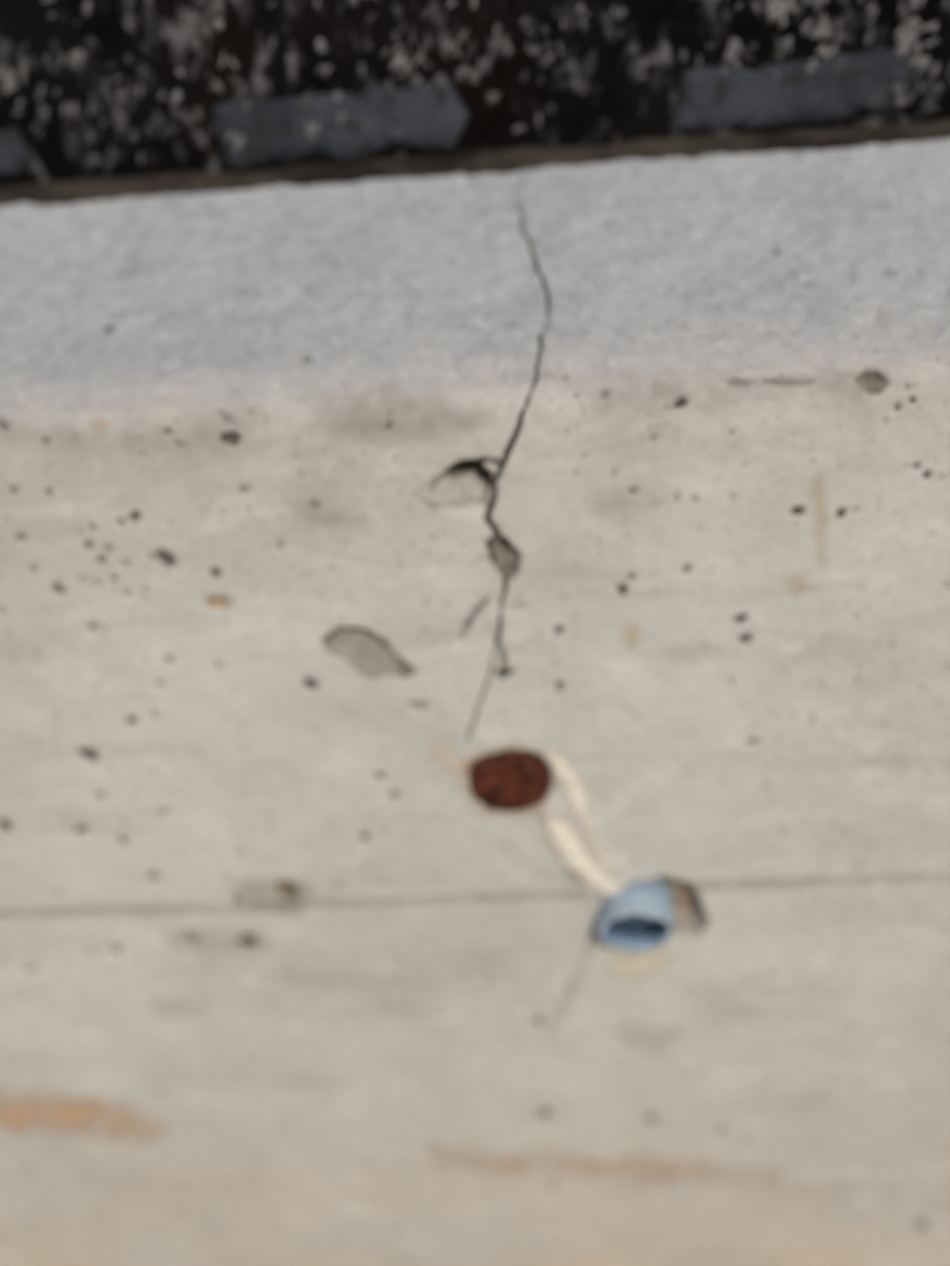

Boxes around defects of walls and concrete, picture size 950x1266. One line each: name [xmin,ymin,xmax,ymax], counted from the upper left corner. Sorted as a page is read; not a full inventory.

crack [480,195,550,537]
spalling [415,459,494,508]
spalling [323,627,416,677]
crack [462,575,508,744]
corrosion [469,750,623,899]